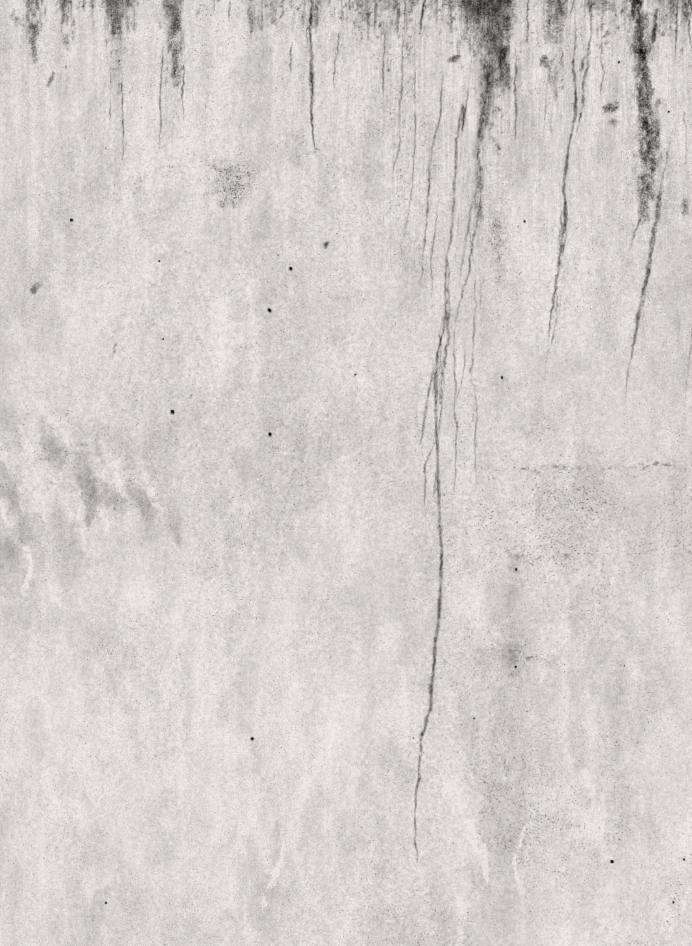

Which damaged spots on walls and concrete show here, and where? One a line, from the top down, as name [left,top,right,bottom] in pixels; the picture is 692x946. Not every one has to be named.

leakage [106,0,131,35]
leakage [439,0,512,98]
crack [550,60,588,318]
leakage [615,0,692,216]
crack [421,526,443,747]